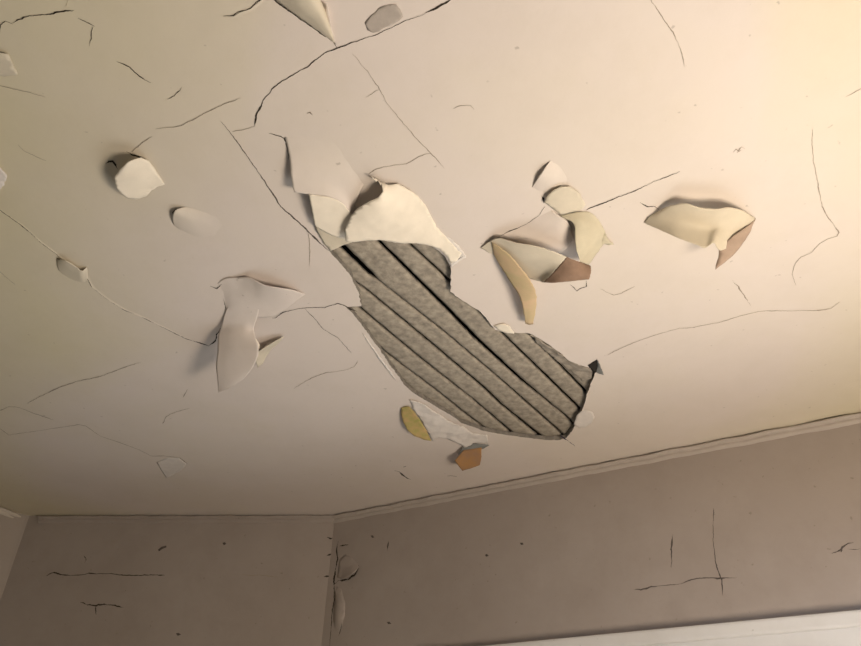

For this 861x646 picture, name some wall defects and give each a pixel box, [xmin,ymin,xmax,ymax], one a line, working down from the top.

crack [0,0,93,46]
peeling [365,4,403,33]
crack [651,0,685,66]
crack [107,0,450,264]
crack [587,171,680,210]
crack [792,133,840,285]
crack [87,275,220,346]
crack [276,303,358,388]
flaking render [333,237,604,436]
crack [1,363,186,463]
crack [324,537,359,637]
crack [635,509,728,595]